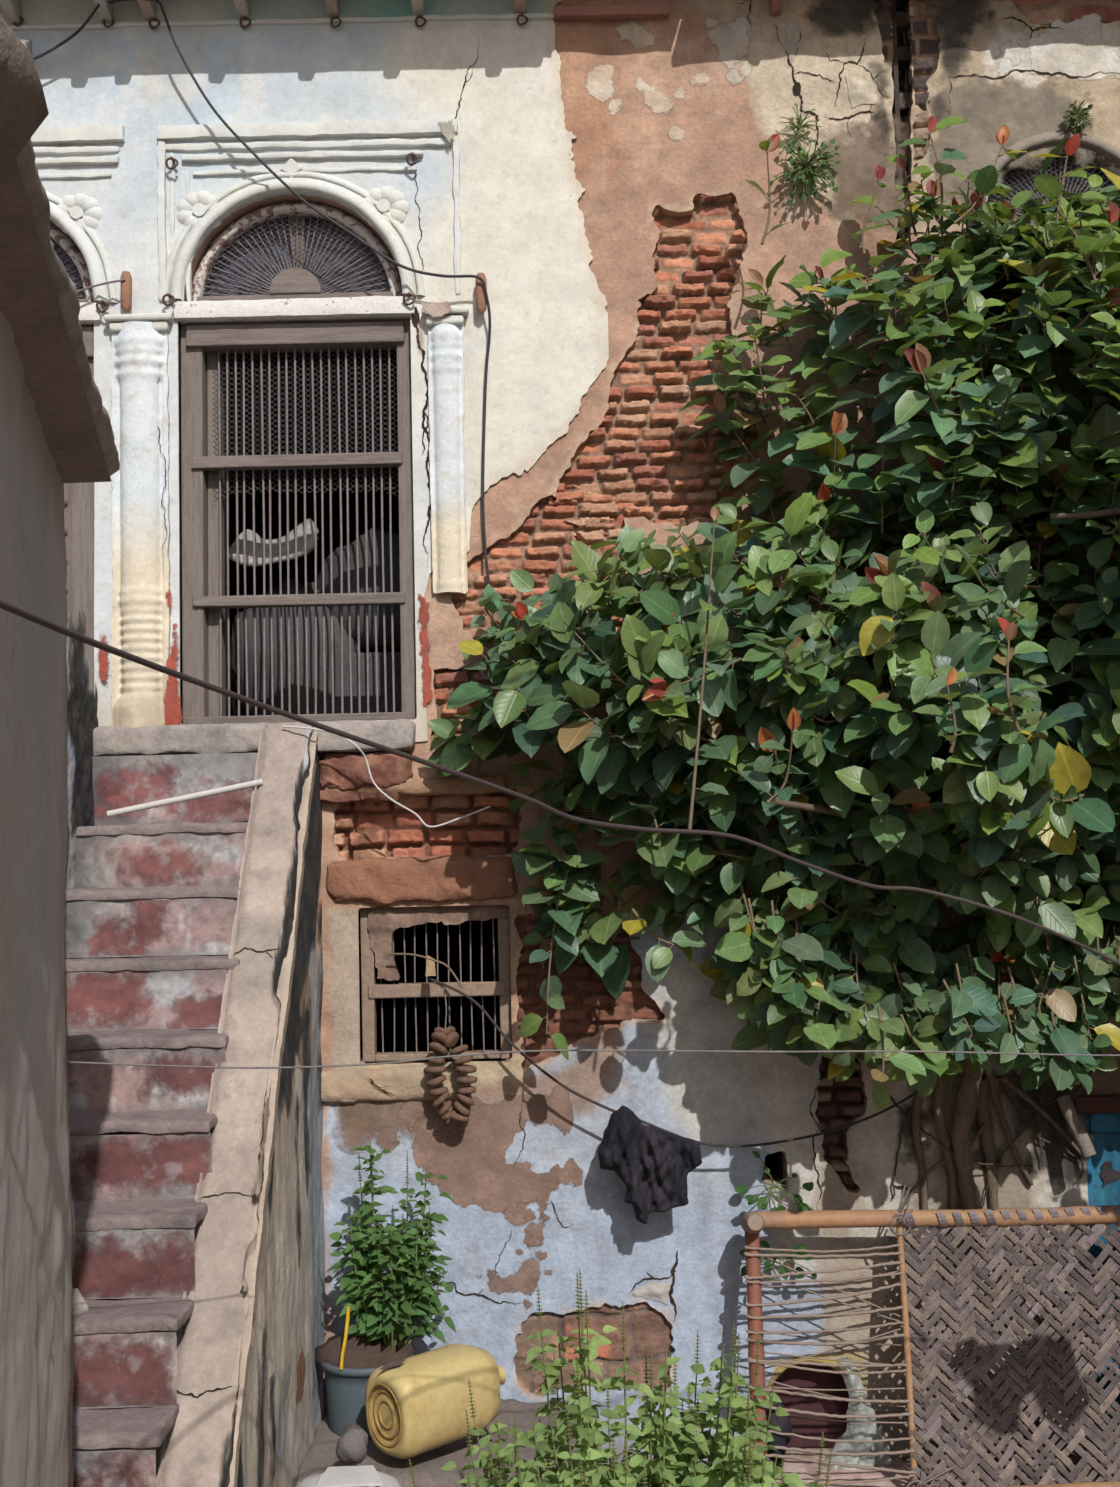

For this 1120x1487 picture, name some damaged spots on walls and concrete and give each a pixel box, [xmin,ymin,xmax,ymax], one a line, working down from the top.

peeling [584,64,622,115]
peeling [635,15,753,141]
crack [739,0,891,198]
water stain [808,0,882,35]
peeling [995,0,1120,81]
spalling [452,194,760,648]
spalling [417,594,515,742]
water stain [65,613,98,888]
spalling [514,912,664,1071]
spalling [815,1049,865,1190]
peeling [376,1085,675,1395]
crack [629,1251,678,1322]